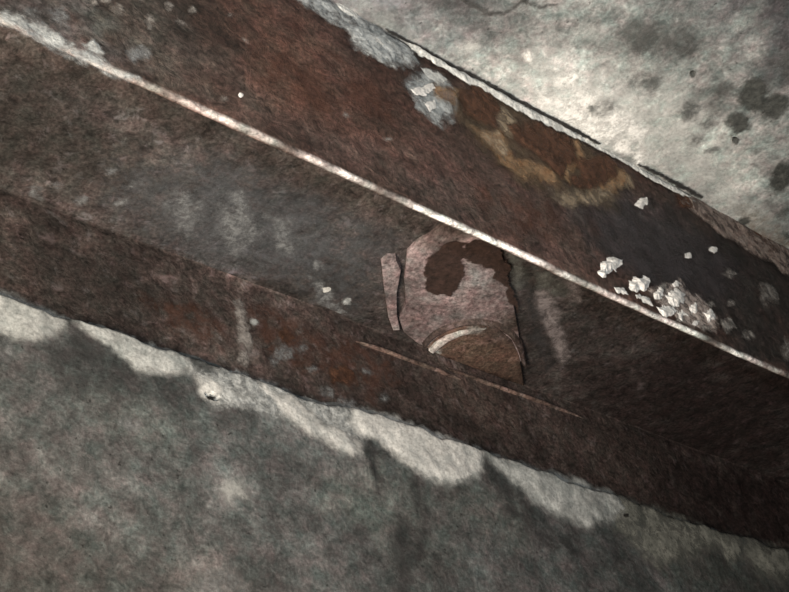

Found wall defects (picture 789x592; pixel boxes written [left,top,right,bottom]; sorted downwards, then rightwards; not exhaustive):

crack [463,0,553,15]
rust [434,85,632,206]
water stain [399,38,763,225]
water stain [719,80,788,145]
water stain [771,163,789,192]
water stain [316,282,351,313]
water stain [605,213,731,300]
water stain [0,292,789,580]